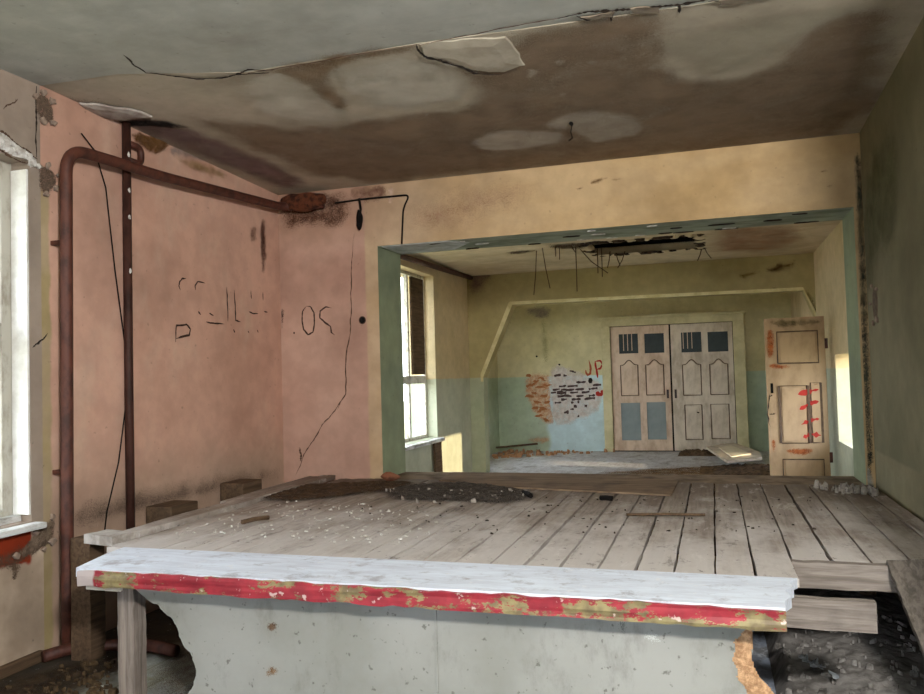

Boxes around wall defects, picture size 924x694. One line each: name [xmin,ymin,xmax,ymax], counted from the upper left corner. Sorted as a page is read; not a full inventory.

crack [124,0,750,80]
flaking render [416,36,538,91]
flaking render [32,89,58,126]
damp [117,6,901,234]
flaking render [0,130,60,197]
flaking render [563,223,738,258]
flaking render [524,364,603,425]